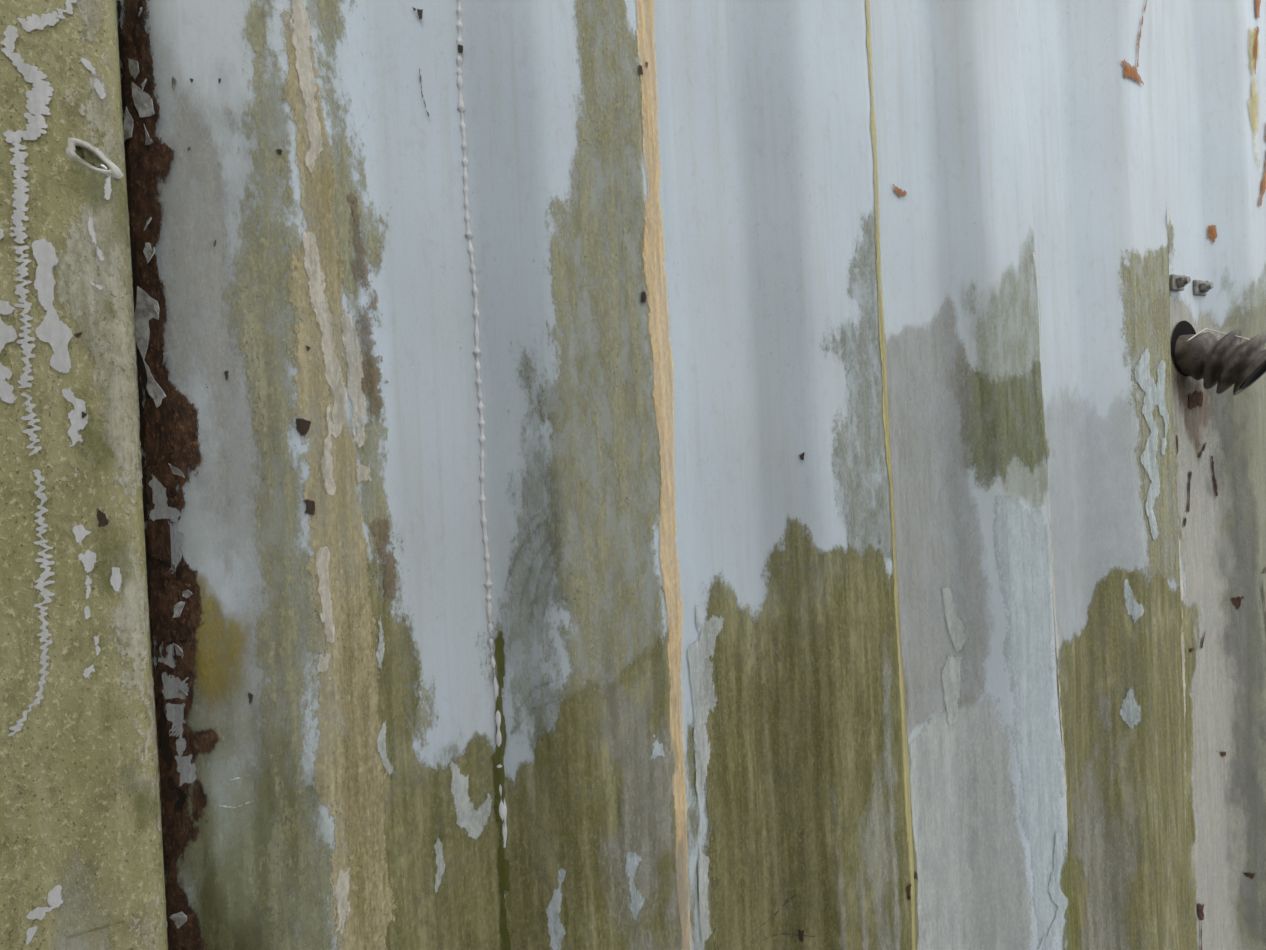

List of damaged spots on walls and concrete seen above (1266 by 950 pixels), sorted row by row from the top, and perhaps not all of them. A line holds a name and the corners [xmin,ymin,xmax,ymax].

rust [117,0,153,125]
rust [1121,1,1147,85]
rust [124,139,140,320]
peeling [0,300,17,404]
peeling [32,0,168,835]
rust [296,418,311,435]
damp [604,0,691,950]
damp [861,0,1133,950]
rust [135,349,243,929]
peeling [942,587,966,725]
peeling [26,885,69,945]
peeling [1039,832,1068,949]